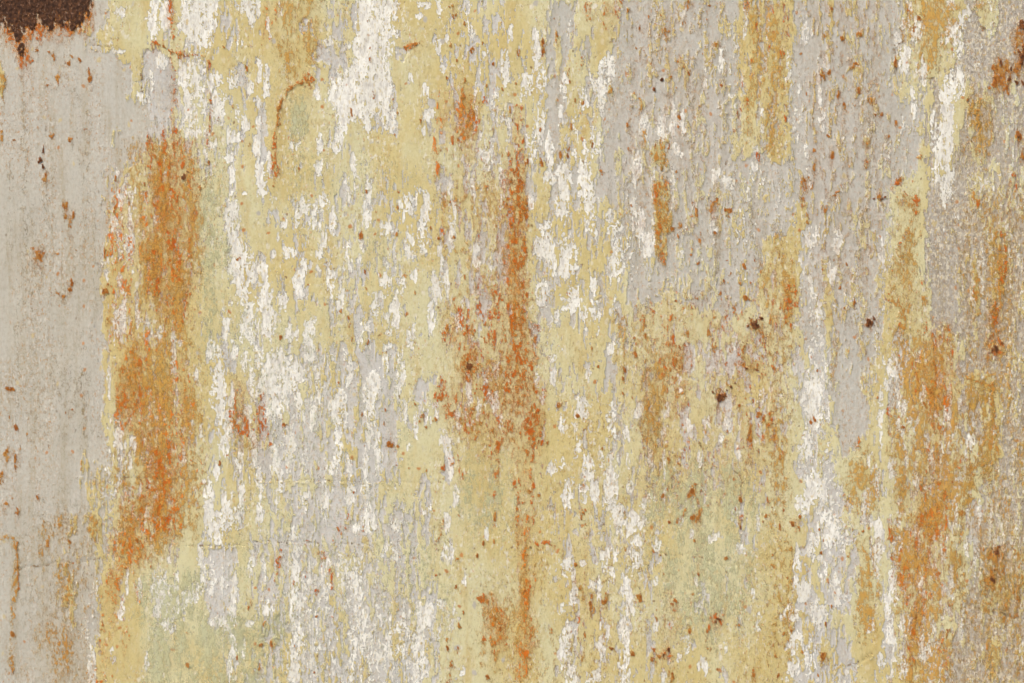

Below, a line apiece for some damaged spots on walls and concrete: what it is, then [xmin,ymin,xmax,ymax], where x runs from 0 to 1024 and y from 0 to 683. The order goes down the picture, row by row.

rust [0,0,92,86]
peeling [232,0,261,30]
peeling [415,0,443,20]
peeling [421,82,446,148]
rust [432,76,487,176]
rust [642,129,682,263]
rust [38,0,211,682]
rust [414,104,562,680]
peeling [438,428,460,535]
rust [885,281,1000,670]
peeling [554,524,588,683]
peeling [645,613,697,683]